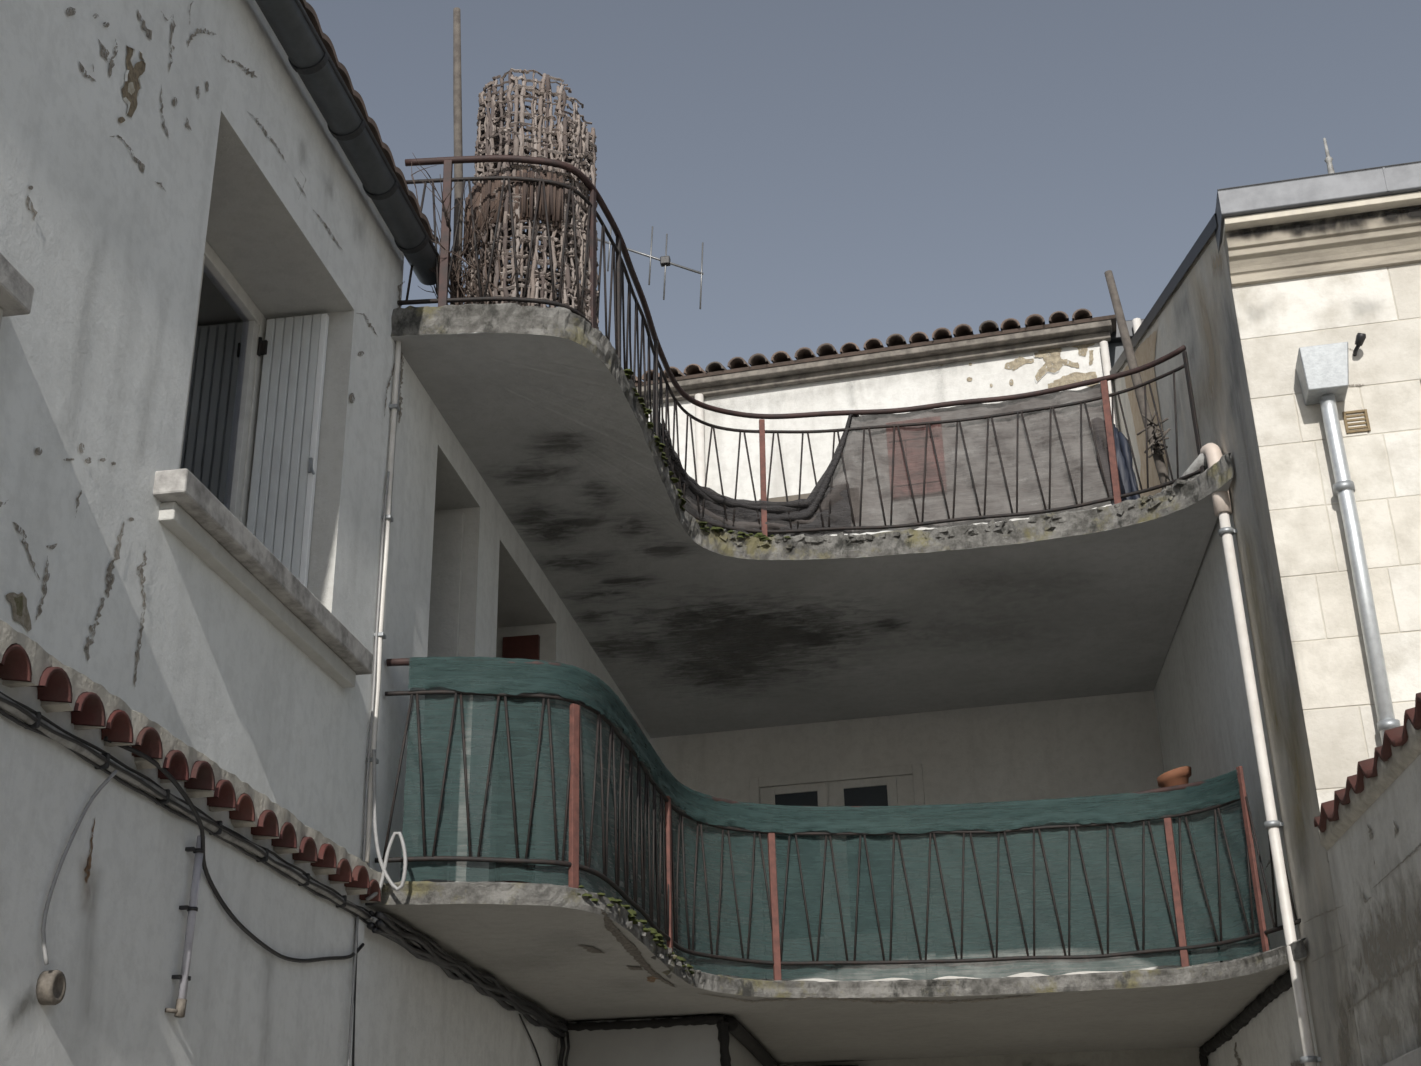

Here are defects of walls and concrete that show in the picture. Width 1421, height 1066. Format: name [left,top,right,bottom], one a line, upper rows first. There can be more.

peeling [79,10,152,123]
water stain [1243,205,1421,236]
peeling [718,330,1187,550]
spalling [6,592,32,632]
crack [1304,820,1421,923]
water stain [1338,897,1421,1066]